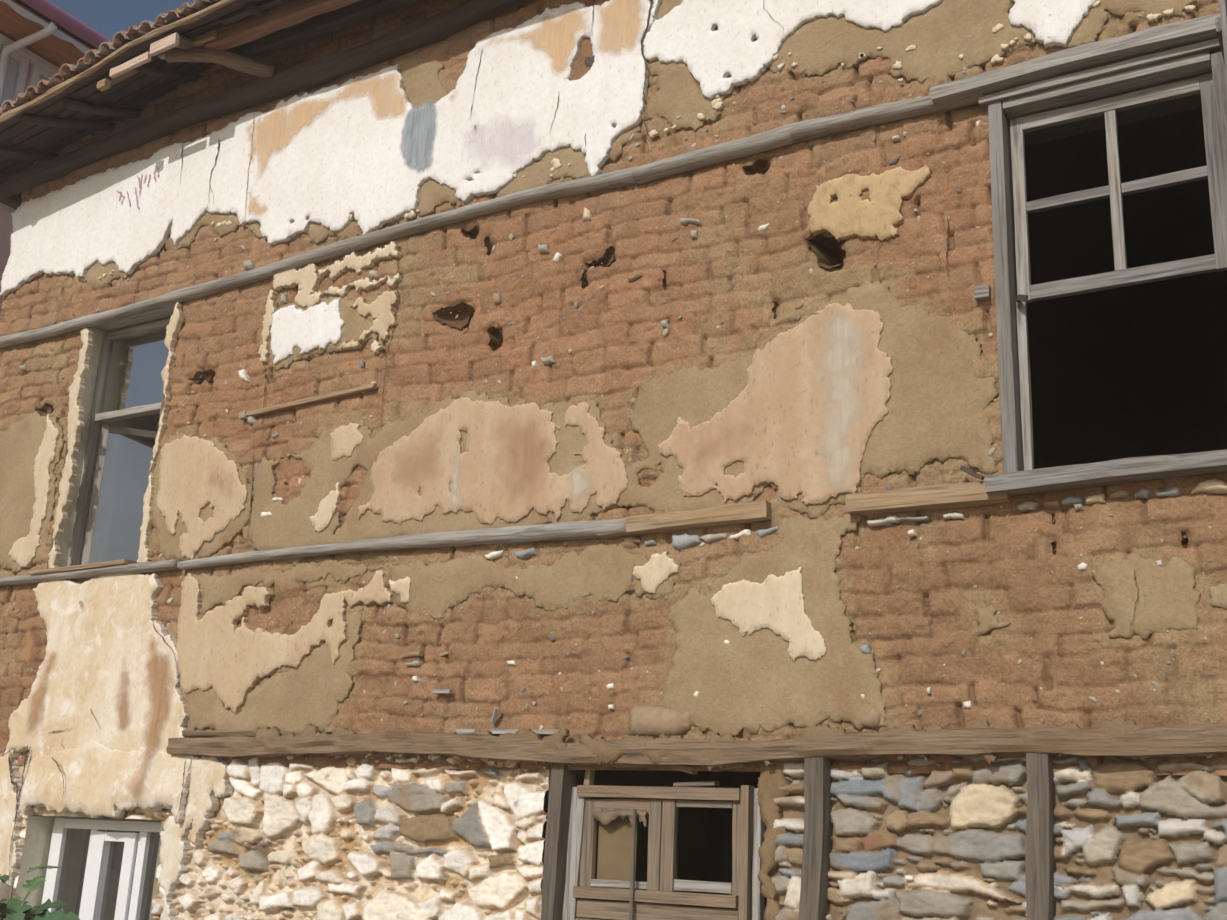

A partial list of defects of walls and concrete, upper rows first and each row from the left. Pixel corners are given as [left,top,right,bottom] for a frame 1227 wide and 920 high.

crack [640,0,653,153]
crack [180,139,220,206]
peeling [0,0,1197,371]
spalling [0,281,999,891]
spalling [1092,531,1227,639]
peeling [153,755,233,920]